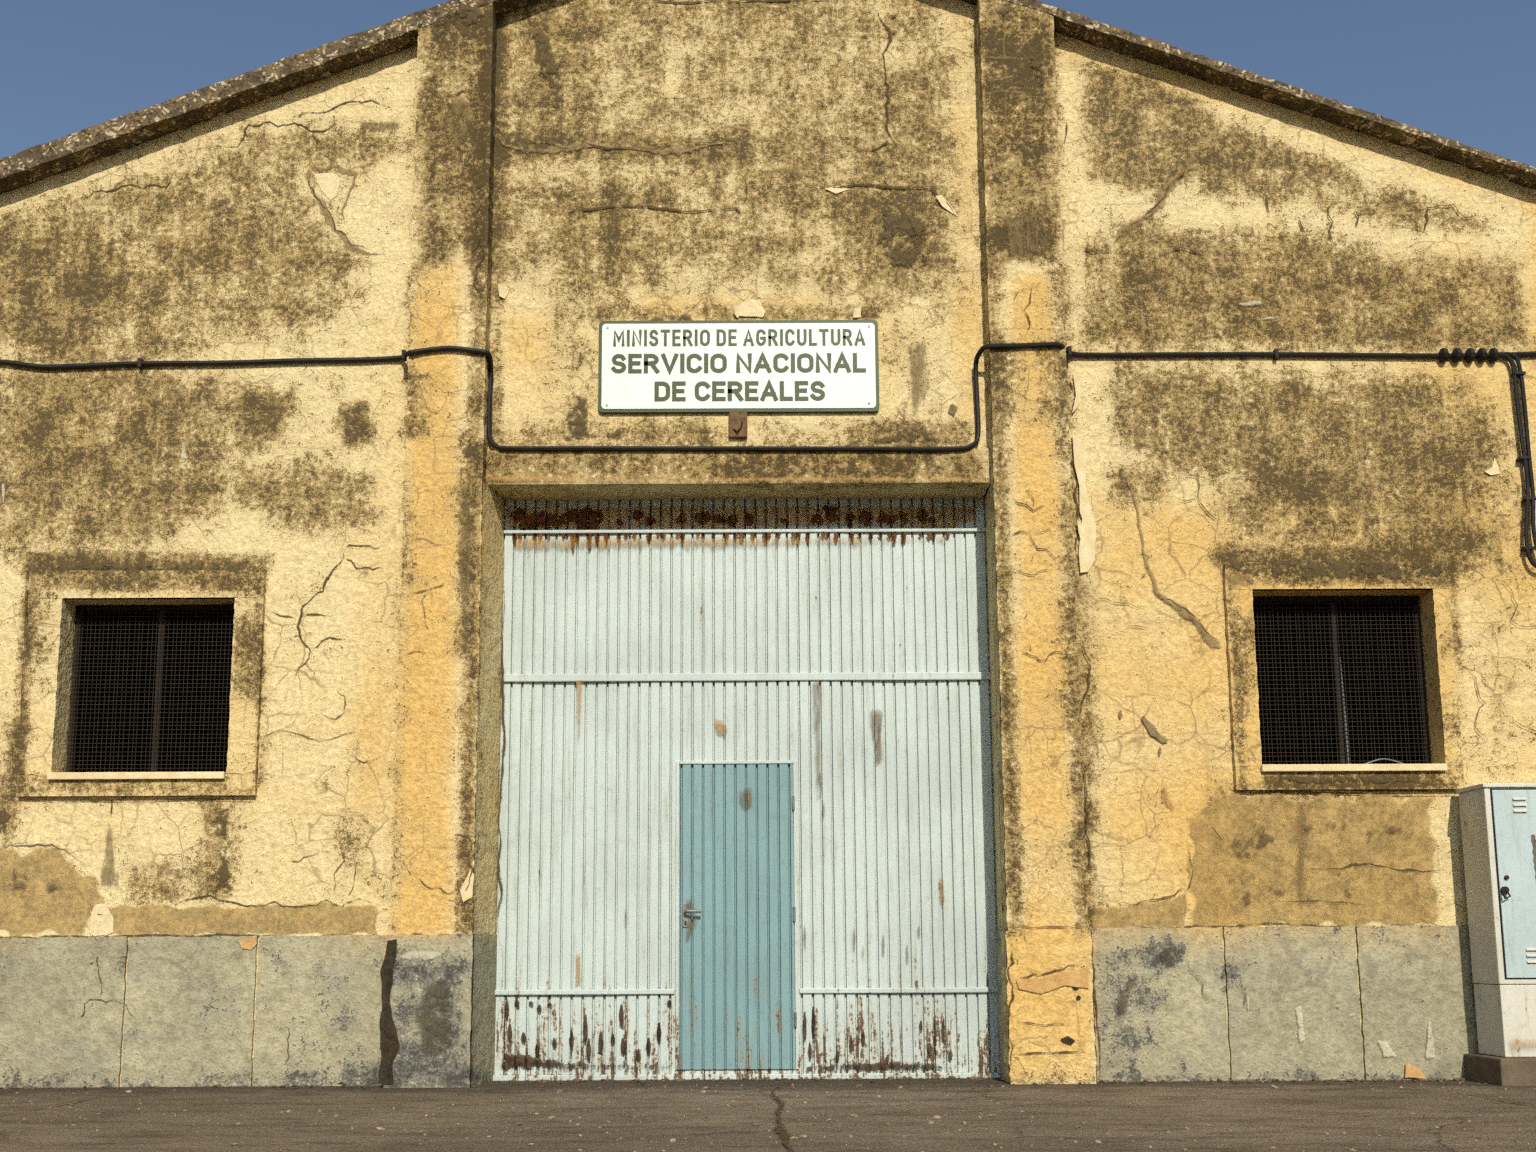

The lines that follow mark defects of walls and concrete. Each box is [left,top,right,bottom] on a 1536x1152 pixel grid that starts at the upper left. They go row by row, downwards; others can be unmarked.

leakage [533,30,565,125]
crack [497,10,958,234]
crack [86,91,397,255]
leakage [876,209,930,274]
rust [507,504,974,552]
crack [1009,375,1277,647]
crack [275,544,381,684]
crack [408,584,443,654]
crack [1023,613,1092,714]
crack [264,691,370,763]
flaking render [89,903,114,936]